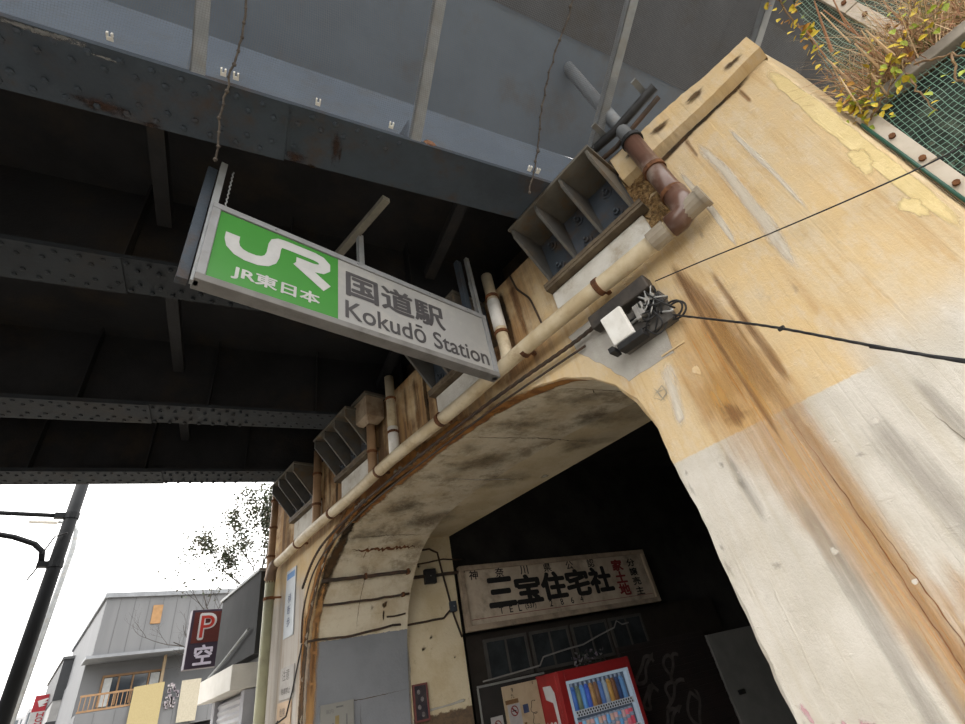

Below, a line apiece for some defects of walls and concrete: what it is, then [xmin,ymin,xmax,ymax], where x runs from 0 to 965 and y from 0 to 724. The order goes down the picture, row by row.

water stain [404,378,438,427]
corrosion [300,379,591,724]
corrosion [676,272,965,702]
crack [776,399,965,674]